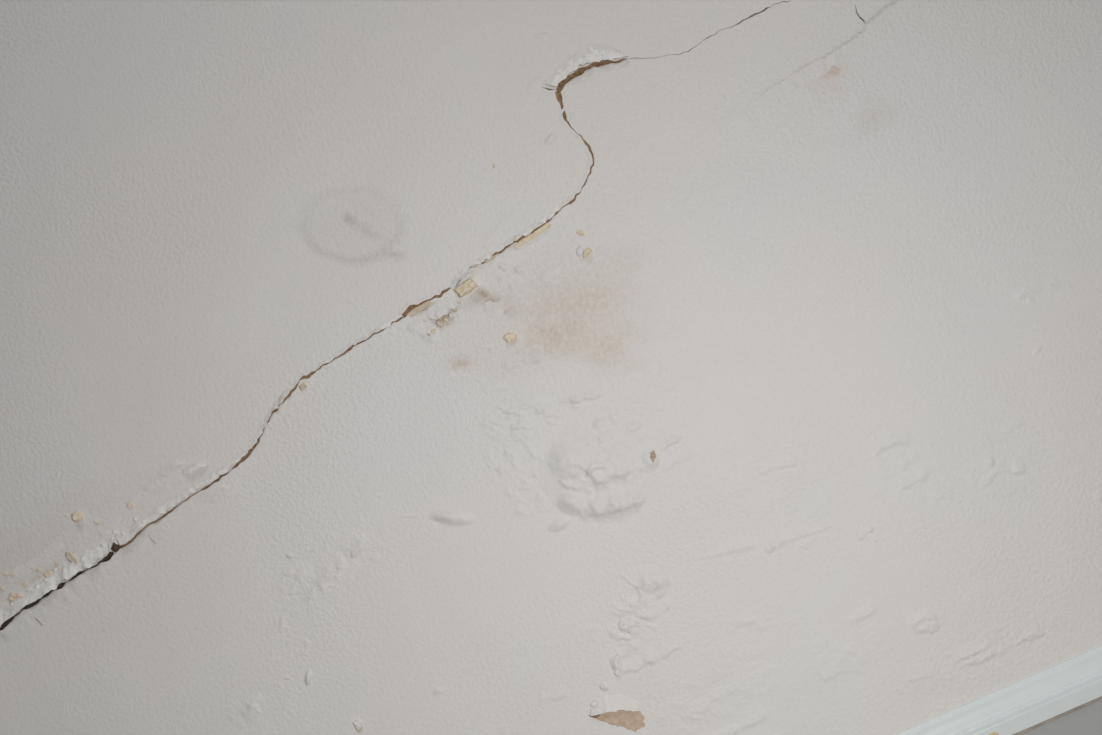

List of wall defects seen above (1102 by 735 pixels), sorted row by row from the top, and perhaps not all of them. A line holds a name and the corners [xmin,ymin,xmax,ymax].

crack [626,0,795,61]
peeling [515,43,629,132]
crack [0,84,597,646]
peeling [587,694,645,732]